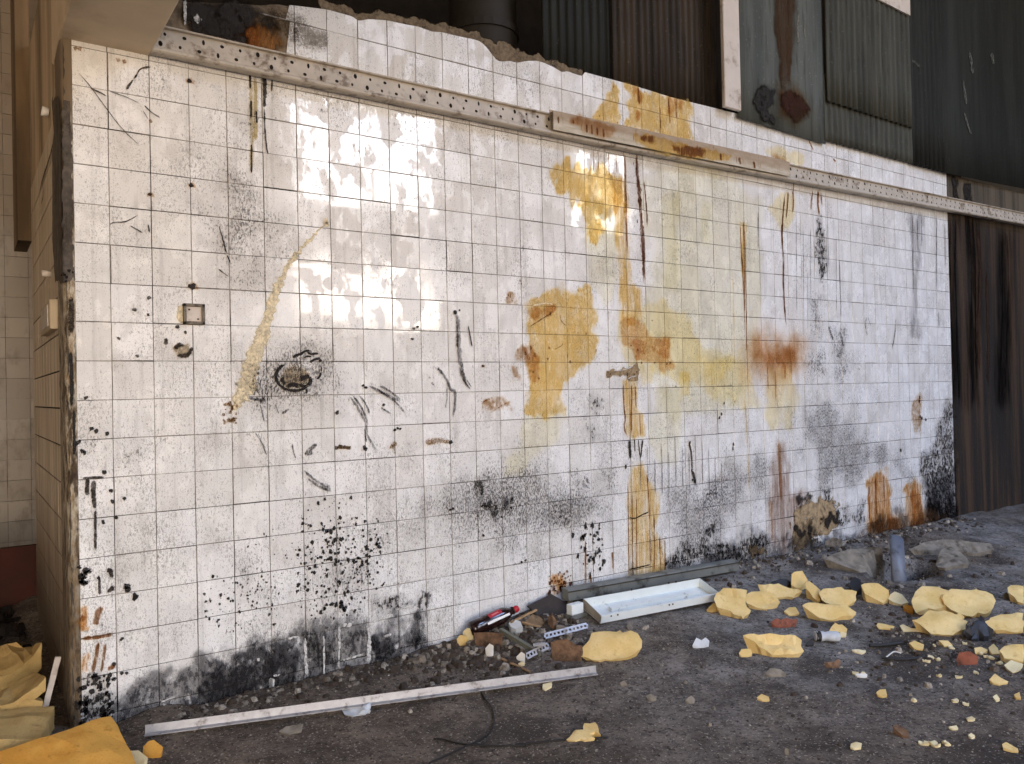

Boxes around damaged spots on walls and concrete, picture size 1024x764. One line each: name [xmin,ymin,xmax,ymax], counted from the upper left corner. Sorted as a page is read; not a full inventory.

spalling [318,0,583,94]
corrosion [775,0,810,122]
corrosion [674,146,705,157]
corrosion [593,152,648,278]
water stain [444,466,614,581]
corrosion [623,387,643,469]
corrosion [628,477,666,571]
water stain [640,398,958,569]
spalling [790,493,840,551]
water stain [114,479,432,721]